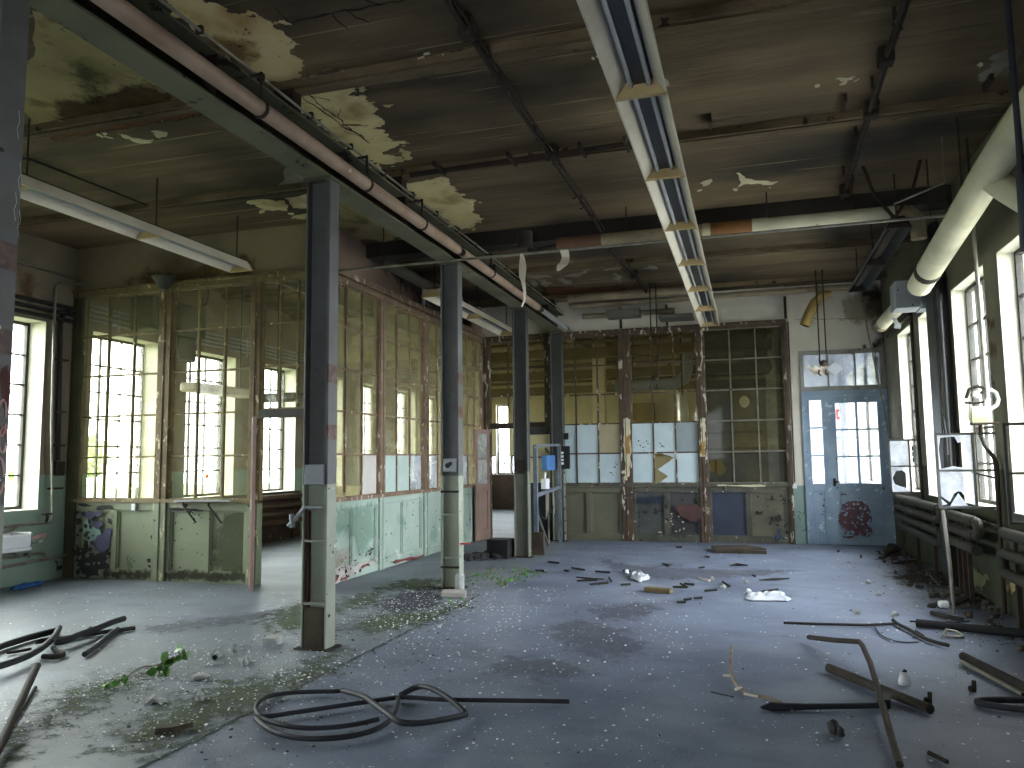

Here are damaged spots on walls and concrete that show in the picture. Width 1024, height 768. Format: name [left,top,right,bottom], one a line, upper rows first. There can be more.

peeling [166,0,305,82]
water stain [56,83,178,120]
peeling [96,130,168,144]
crack [302,95,369,143]
peeling [301,86,412,169]
peeling [246,160,307,220]
peeling [407,177,484,231]
peeling [733,173,778,191]
peeling [621,418,632,480]
peeling [73,503,114,578]
peeling [329,497,425,584]